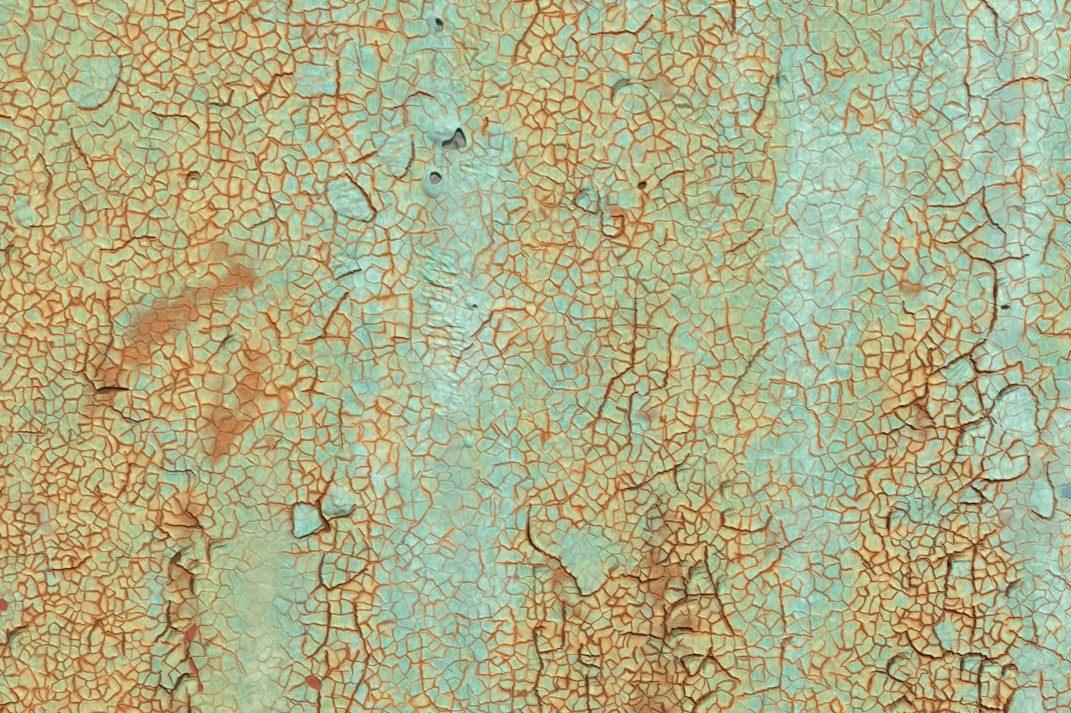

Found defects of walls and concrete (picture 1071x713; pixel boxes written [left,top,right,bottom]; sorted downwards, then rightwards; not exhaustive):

crack [1005,0,1071,182]
crack [514,216,601,259]
corrosion [102,271,252,404]
crack [198,258,292,365]
peeling [946,358,976,387]
peeling [962,386,1039,481]
peeling [959,488,982,503]
peeling [1032,481,1054,519]
peeling [171,543,229,595]
crack [181,605,256,696]
crack [783,678,842,713]
crack [866,655,1071,713]